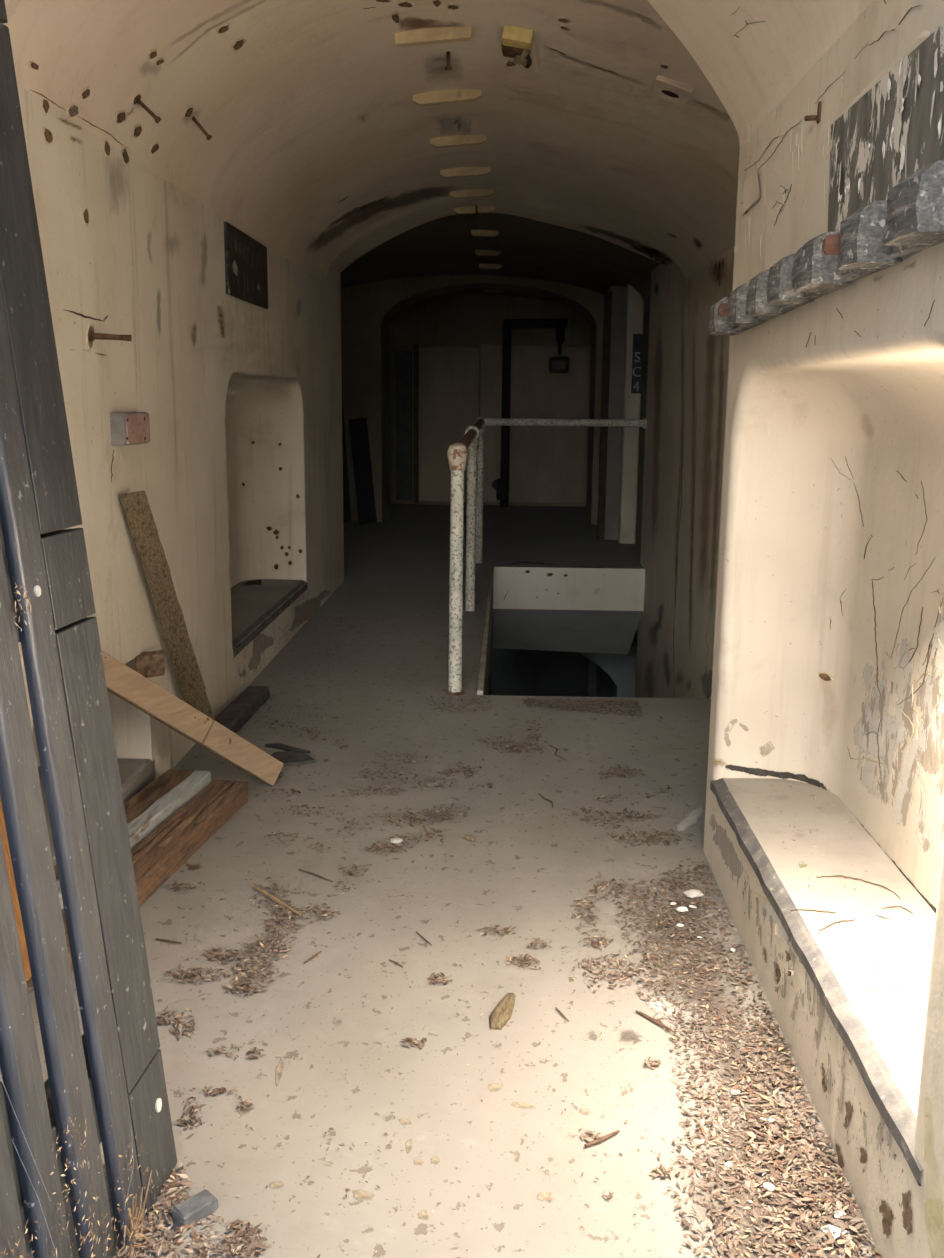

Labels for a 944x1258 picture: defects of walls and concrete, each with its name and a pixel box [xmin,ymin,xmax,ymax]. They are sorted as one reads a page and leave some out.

crack [747,0,920,226]
damp [702,670,713,699]
crack [830,457,943,780]
peeling [854,594,944,862]